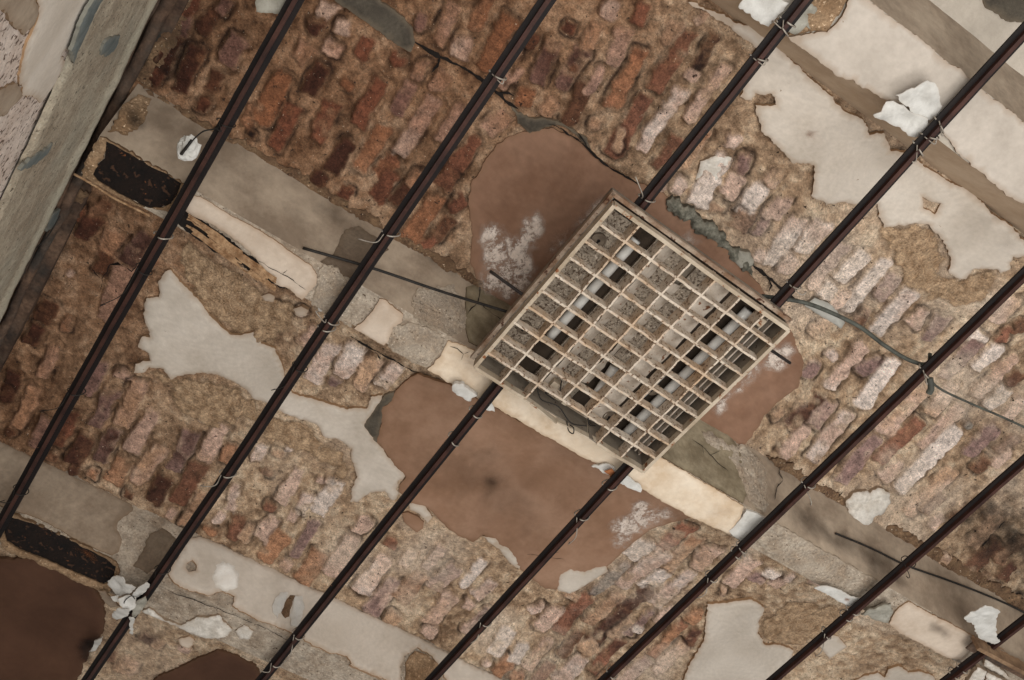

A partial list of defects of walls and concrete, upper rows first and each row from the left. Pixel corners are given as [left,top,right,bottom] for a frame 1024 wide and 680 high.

peeling [255,0,286,14]
peeling [688,0,789,49]
crack [415,42,518,109]
peeling [740,0,970,205]
crack [549,124,641,186]
peeling [943,89,1024,203]
leakage [481,216,544,299]
peeling [875,158,1024,306]
peeling [134,135,405,502]
peeling [339,198,1024,680]
leakage [613,501,669,545]